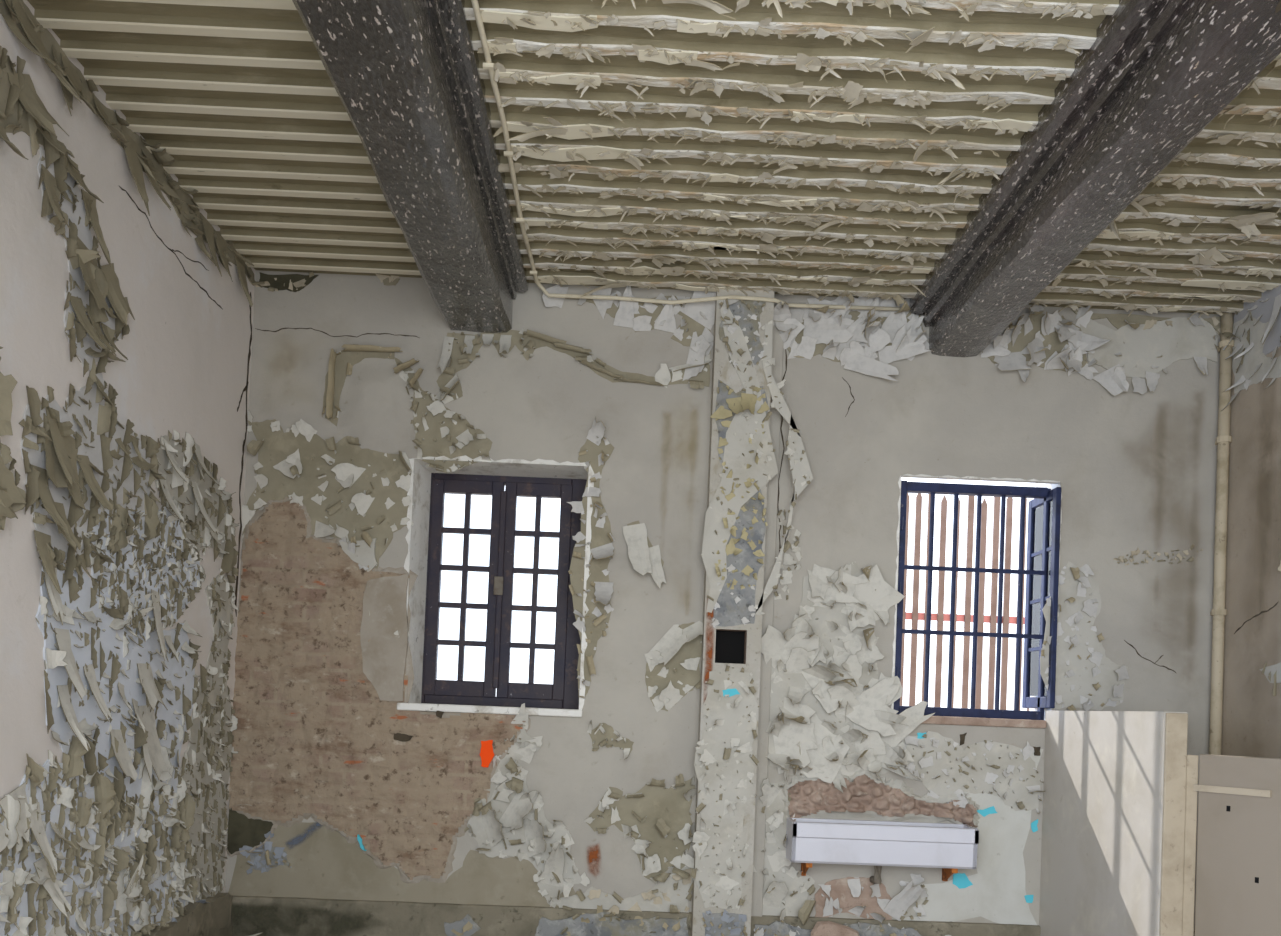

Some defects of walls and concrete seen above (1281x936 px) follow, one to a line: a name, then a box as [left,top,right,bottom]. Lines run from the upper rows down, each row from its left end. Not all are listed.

peeling [477,0,619,111]
peeling [644,20,667,36]
peeling [662,0,931,47]
peeling [944,0,1108,52]
peeling [981,53,1281,411]
crack [119,186,419,617]
spalling [0,43,1066,936]